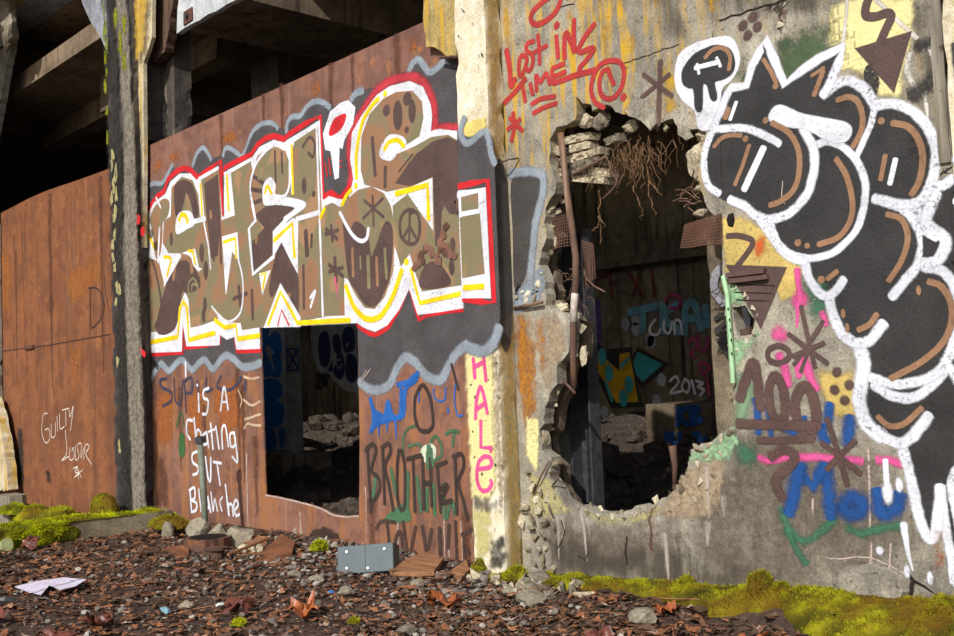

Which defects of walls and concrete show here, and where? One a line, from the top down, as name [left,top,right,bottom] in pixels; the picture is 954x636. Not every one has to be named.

crack [712,0,784,38]
peeling [623,97,658,131]
peeling [677,123,694,141]
spalling [530,461,570,518]
spalling [585,428,738,523]